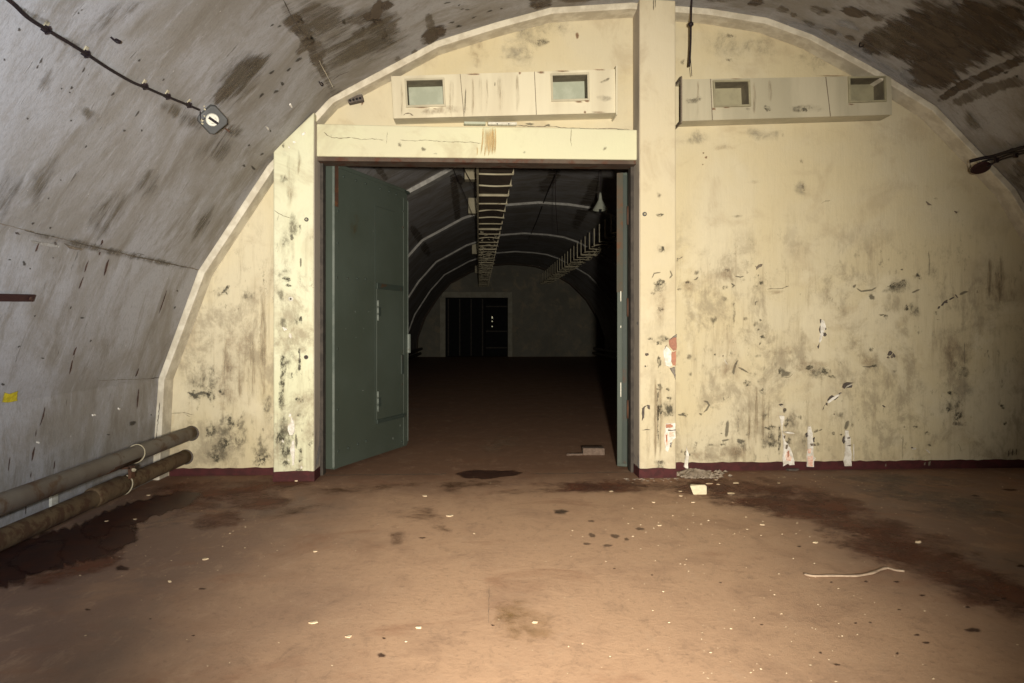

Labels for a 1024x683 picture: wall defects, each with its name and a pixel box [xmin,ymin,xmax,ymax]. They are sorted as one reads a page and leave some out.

leakage [215,57,267,103]
leakage [284,0,404,83]
leakage [412,15,446,54]
leakage [778,0,1024,127]
rust [477,130,496,155]
spalling [663,334,677,380]
peeling [823,382,853,409]
leakage [206,417,245,462]
spalling [664,423,676,452]
spalling [778,404,822,467]
spalling [840,421,854,466]